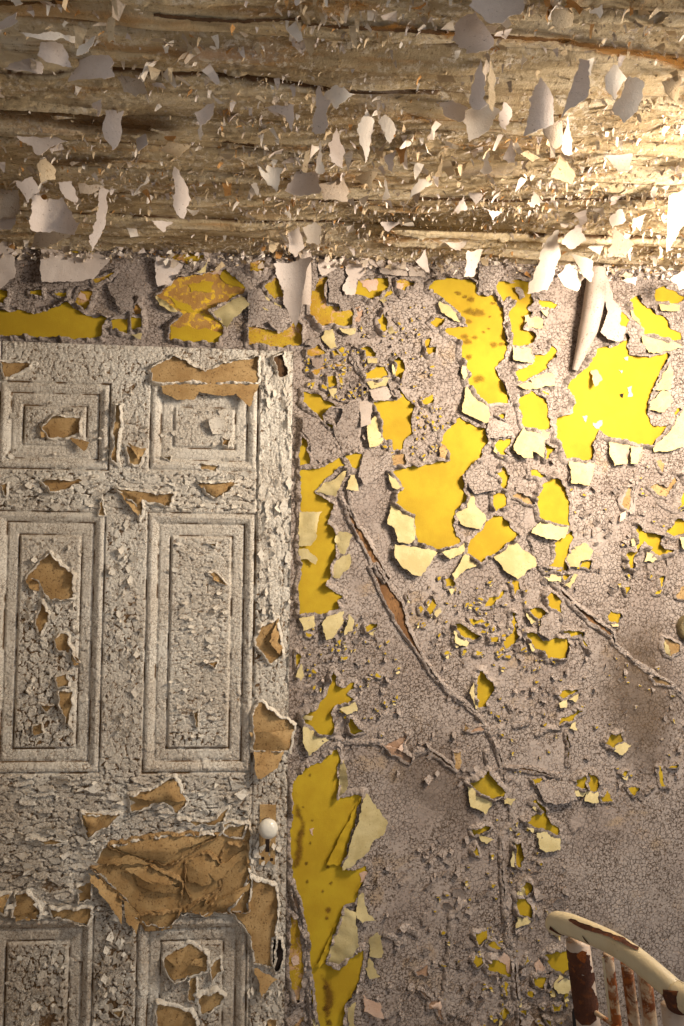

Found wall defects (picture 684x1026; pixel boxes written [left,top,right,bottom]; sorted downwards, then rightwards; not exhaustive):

peeling [0,0,115,82]
peeling [285,85,355,202]
peeling [378,115,396,200]
peeling [406,159,443,204]
peeling [454,192,502,220]
peeling [436,60,539,163]
peeling [527,191,545,207]
peeling [542,58,591,183]
peeling [612,76,645,123]
peeling [0,209,684,1026]
crack [526,534,684,703]
crack [301,352,573,1026]